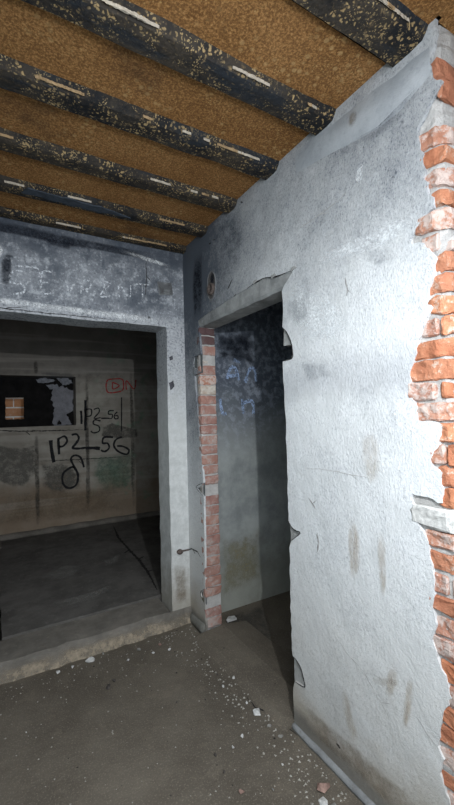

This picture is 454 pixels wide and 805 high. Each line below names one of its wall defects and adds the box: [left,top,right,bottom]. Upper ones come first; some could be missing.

flaking render [36,378,74,426]
flaking render [408,25,454,805]
crack [113,526,158,590]